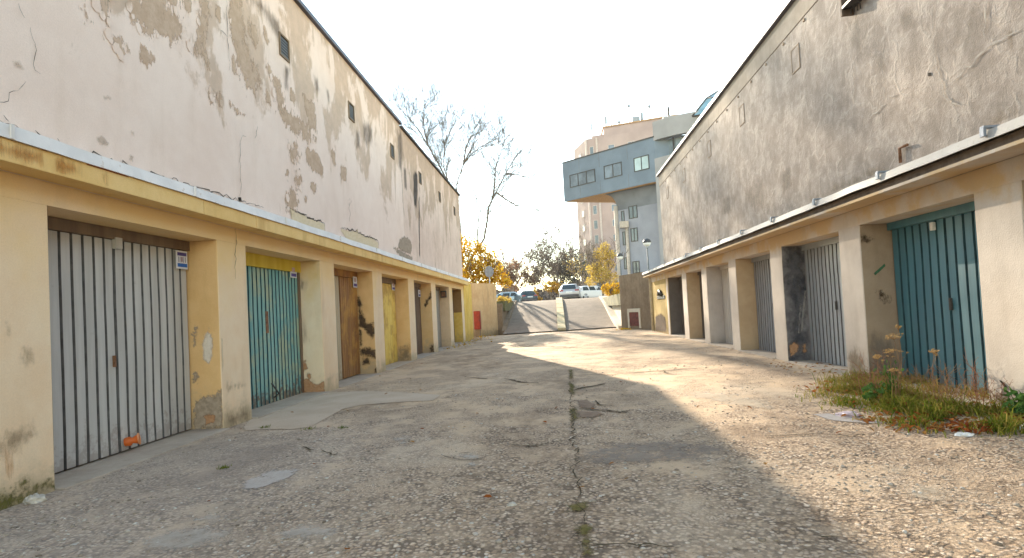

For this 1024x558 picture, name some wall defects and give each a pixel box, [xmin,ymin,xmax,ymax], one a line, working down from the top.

peeling [81,0,347,231]
crack [92,127,262,207]
peeling [192,327,223,371]
flaking render [193,389,223,429]
crack [512,368,689,558]